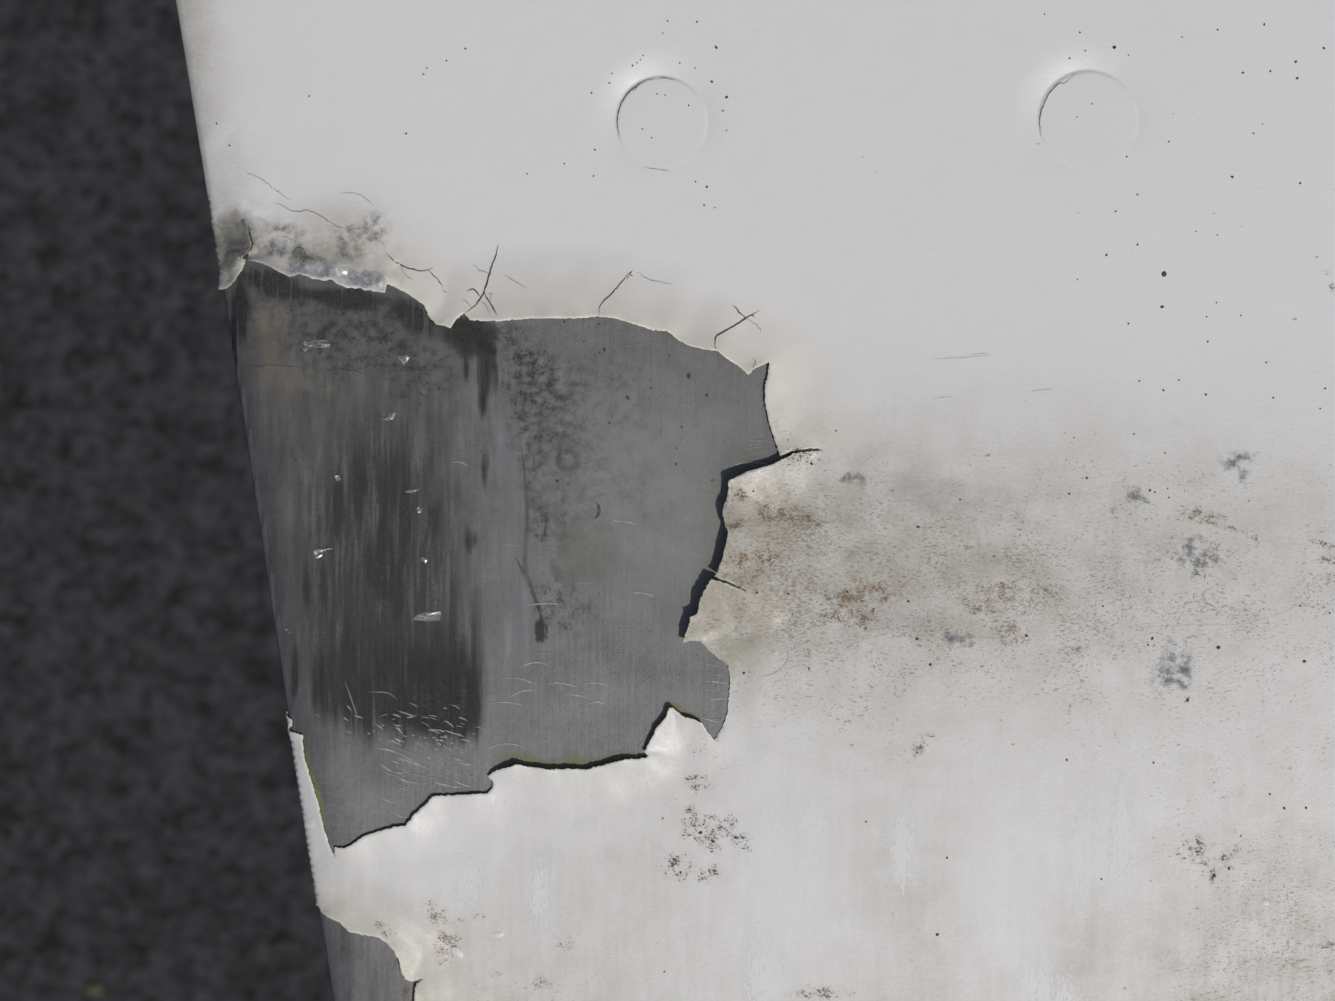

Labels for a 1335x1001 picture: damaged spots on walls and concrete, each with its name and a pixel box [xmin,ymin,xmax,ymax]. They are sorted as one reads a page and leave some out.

peeling [214,197,896,1001]